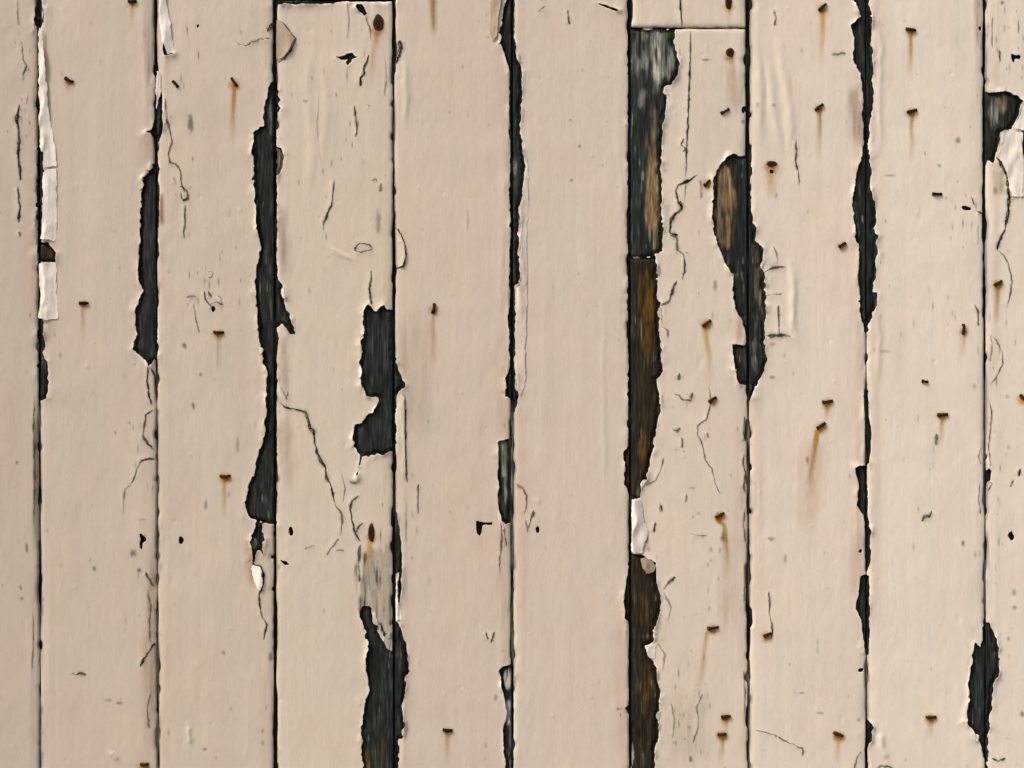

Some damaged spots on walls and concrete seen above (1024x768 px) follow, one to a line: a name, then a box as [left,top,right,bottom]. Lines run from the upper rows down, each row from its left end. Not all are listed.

peeling [133,71,163,369]
peeling [245,74,295,591]
crack [281,393,363,582]
peeling [352,304,406,479]
peeling [360,501,410,768]
peeling [490,0,529,420]
peeling [623,24,681,768]
crack [662,0,697,336]
peeling [712,151,768,401]
rust [810,426,825,470]
peeling [851,0,878,333]
peeling [967,614,1000,768]